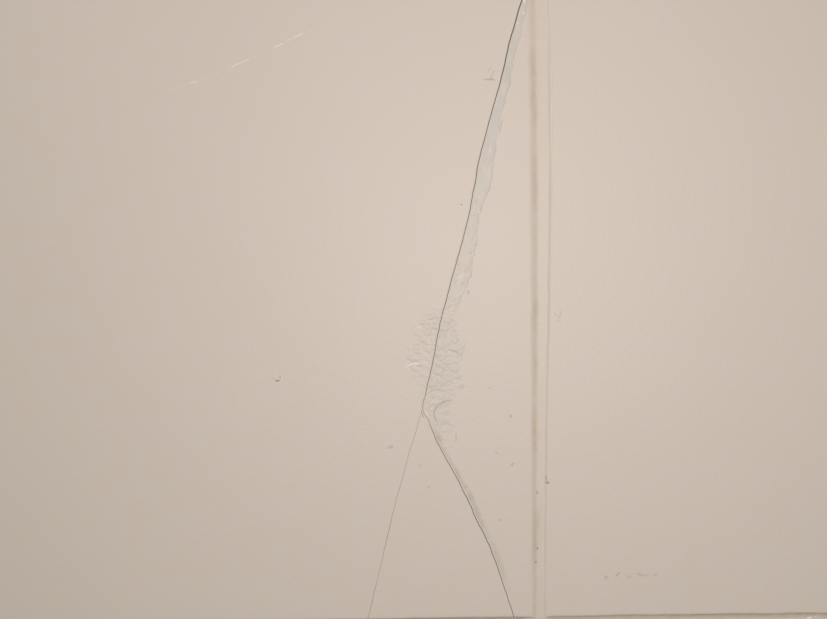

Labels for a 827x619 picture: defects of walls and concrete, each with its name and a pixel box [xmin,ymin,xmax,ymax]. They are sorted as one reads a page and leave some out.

crack [368,0,523,619]